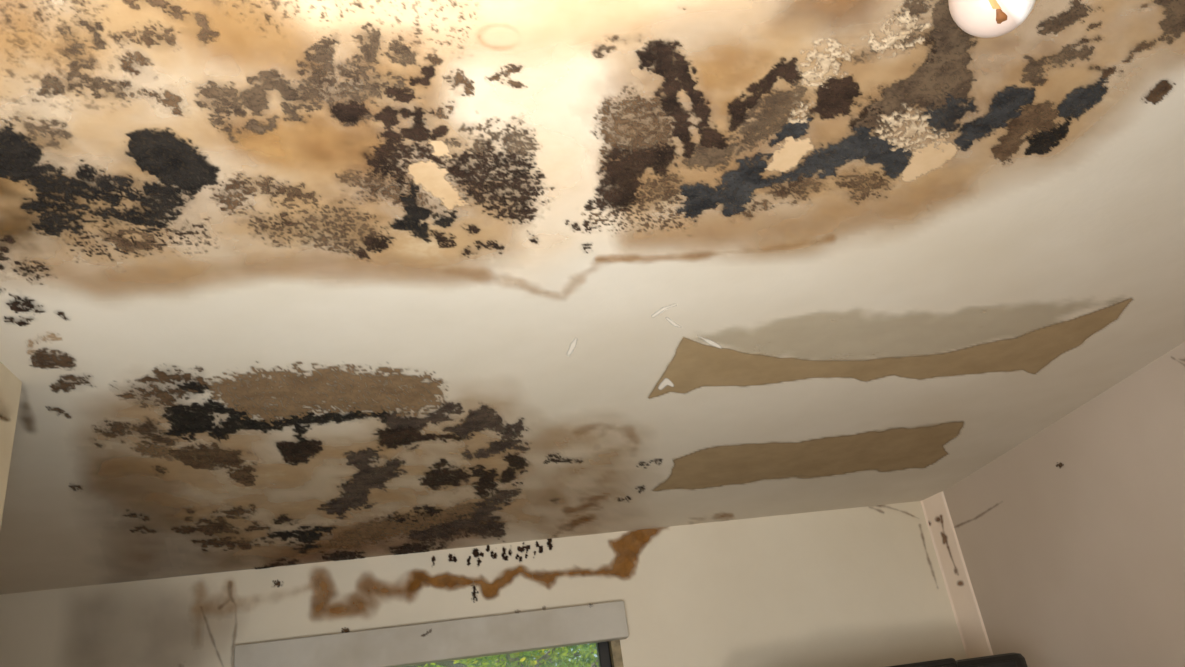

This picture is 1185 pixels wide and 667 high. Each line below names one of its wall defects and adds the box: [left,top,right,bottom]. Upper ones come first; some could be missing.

leakage [0,0,1185,283]
leakage [0,289,67,326]
leakage [30,348,91,393]
leakage [95,362,553,587]
leakage [544,437,645,501]